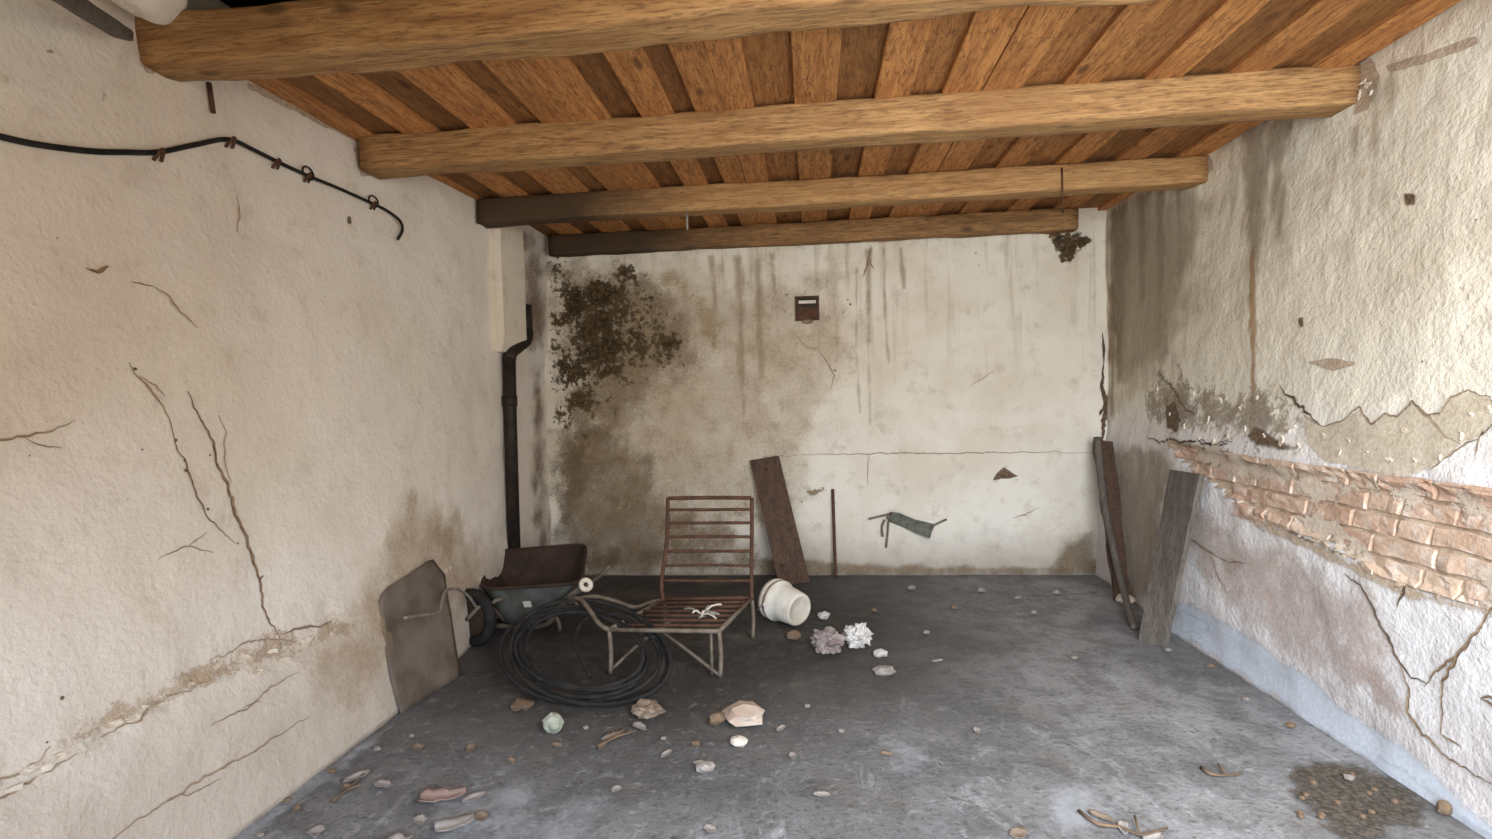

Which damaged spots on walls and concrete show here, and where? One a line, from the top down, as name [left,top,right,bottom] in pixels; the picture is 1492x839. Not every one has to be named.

damp [1245,119,1288,256]
damp [1108,190,1194,379]
crack [0,420,76,448]
crack [129,362,332,726]
damp [535,257,777,575]
flaking render [1146,364,1492,614]
spalling [0,622,353,799]
crack [113,717,308,839]
crack [1345,574,1492,784]